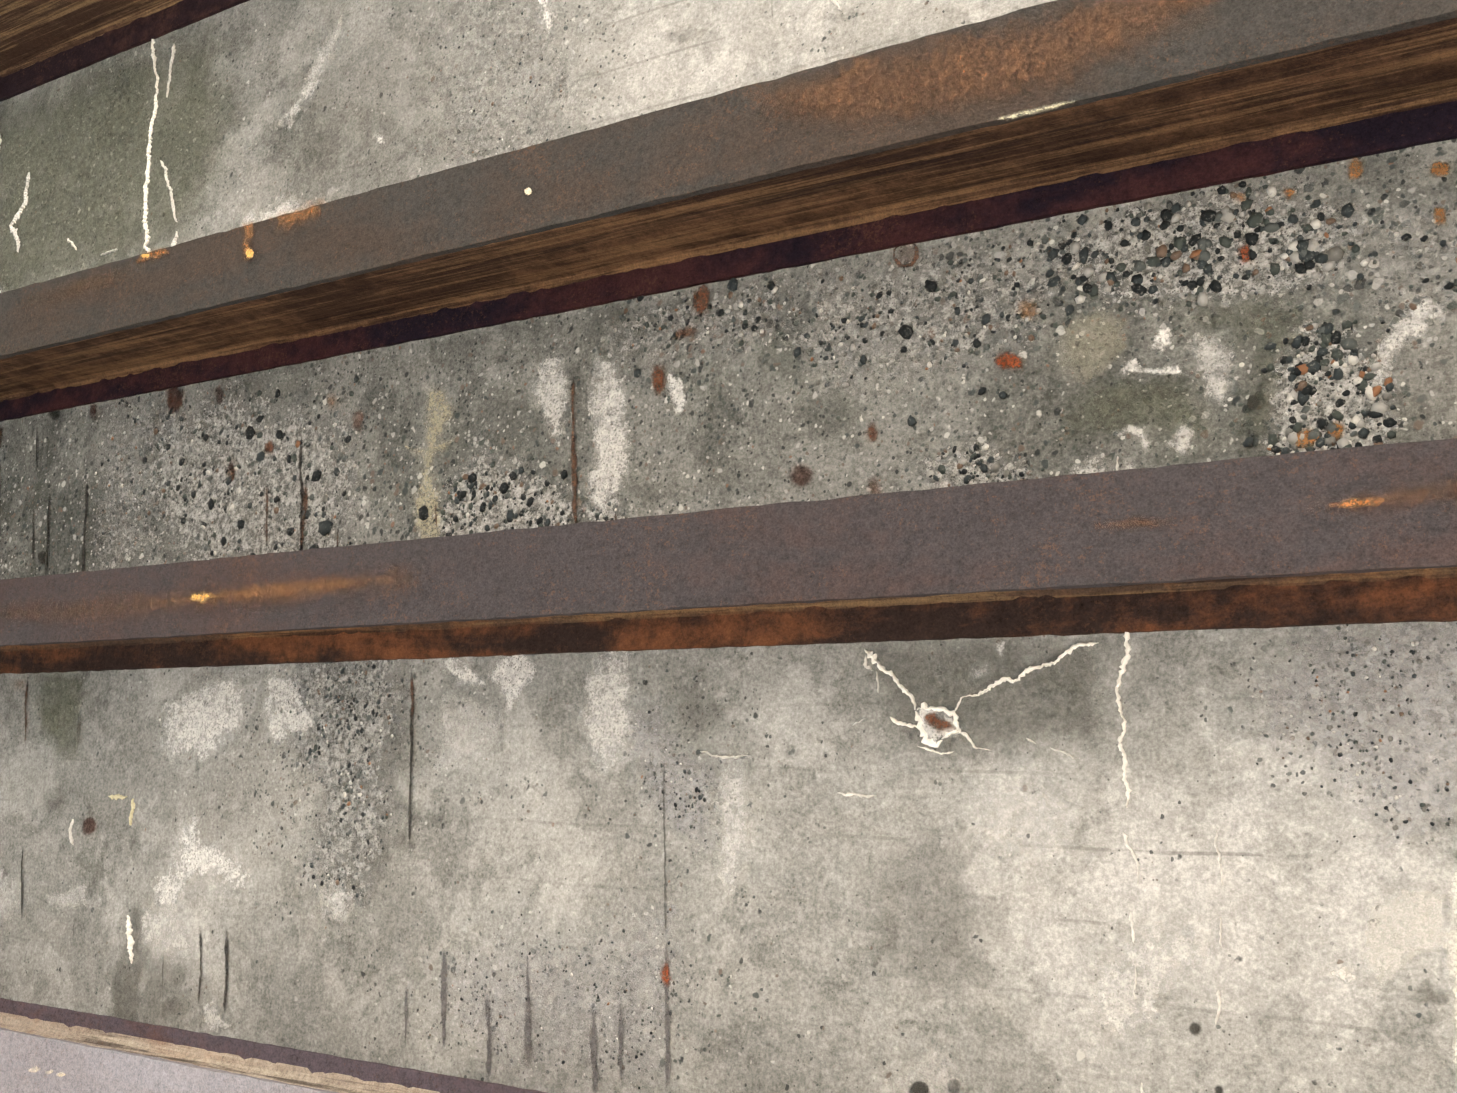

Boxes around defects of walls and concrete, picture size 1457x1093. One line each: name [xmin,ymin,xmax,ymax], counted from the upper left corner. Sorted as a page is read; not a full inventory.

rust [784,0,1207,115]
crack [67,39,178,256]
crack [9,172,30,252]
rust [138,249,167,262]
rust [243,221,254,258]
rust [1337,489,1427,508]
crack [852,632,1140,997]
water stain [1331,872,1457,1064]